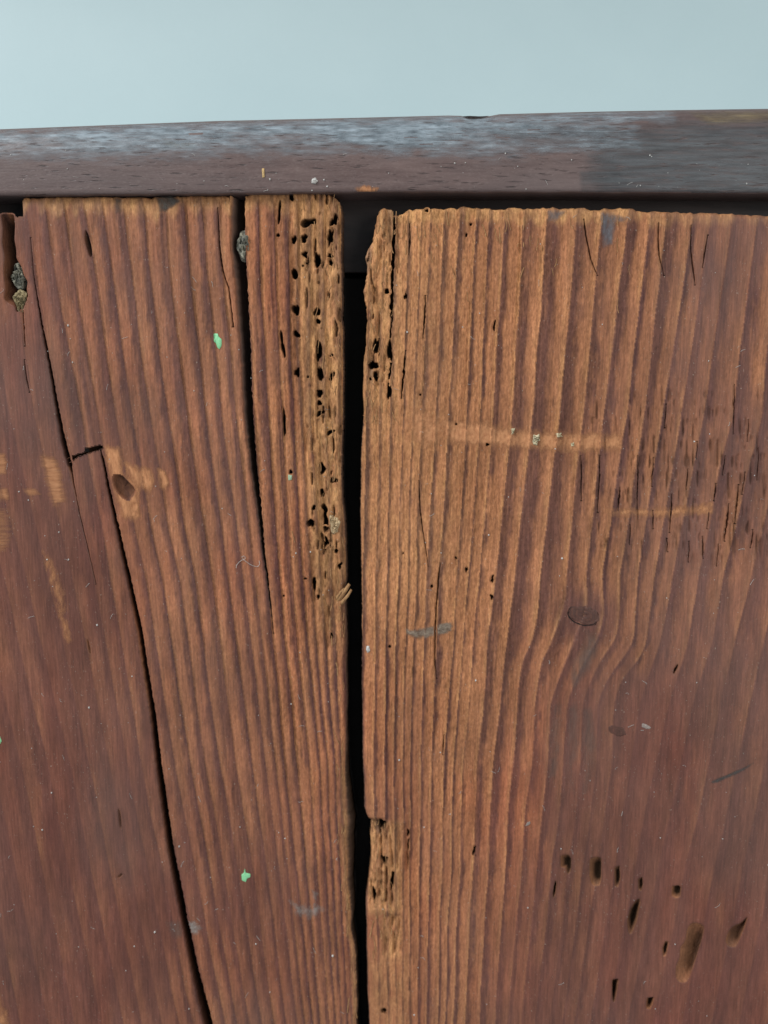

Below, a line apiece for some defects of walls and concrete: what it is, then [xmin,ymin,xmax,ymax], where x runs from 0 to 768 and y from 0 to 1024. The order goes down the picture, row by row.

crack [20,238,215,1024]
crack [216,196,275,634]